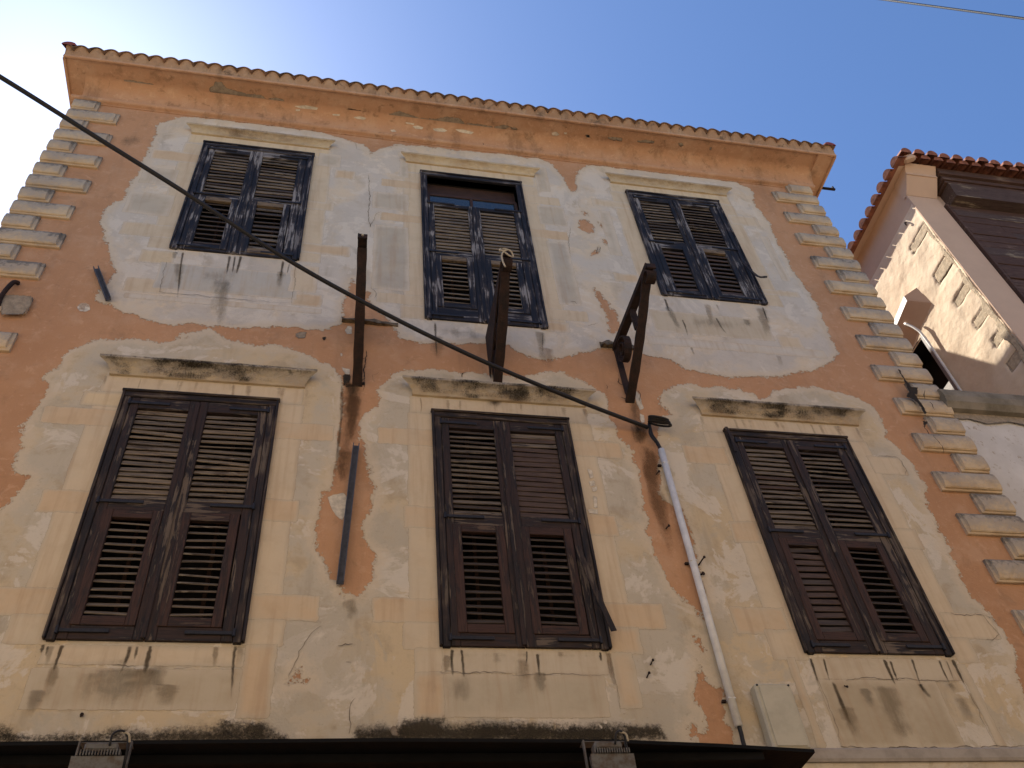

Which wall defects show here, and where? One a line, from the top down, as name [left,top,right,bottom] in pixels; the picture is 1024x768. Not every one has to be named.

corrosion [348,387,359,426]
peeling [0,116,840,745]
peeling [657,383,1024,748]
leakage [125,647,152,670]
leakage [810,659,847,715]
mould [0,721,285,741]
mould [356,718,665,740]